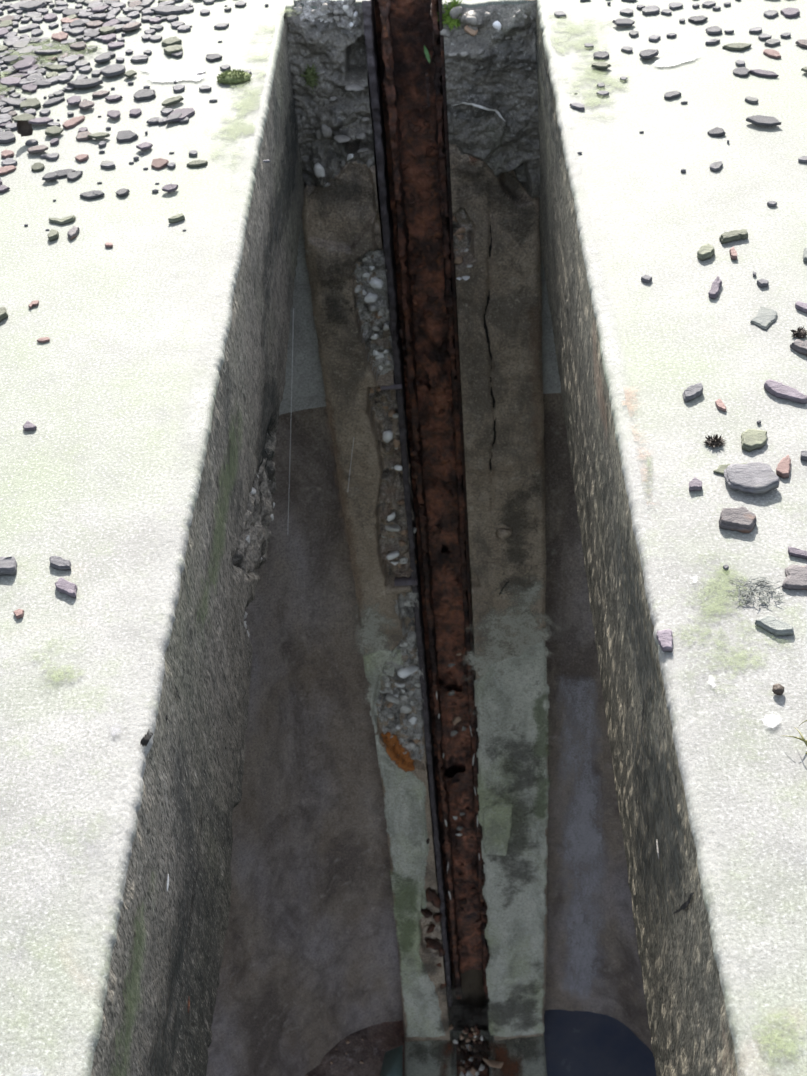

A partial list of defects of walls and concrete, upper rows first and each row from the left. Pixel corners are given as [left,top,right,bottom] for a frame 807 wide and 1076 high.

spalling [440,2,531,57]
flaking render [450,99,507,162]
crack [484,291,496,471]
spalling [231,458,277,574]
corrosion [381,732,415,772]
leakage [474,740,540,907]
leakage [410,981,547,1065]